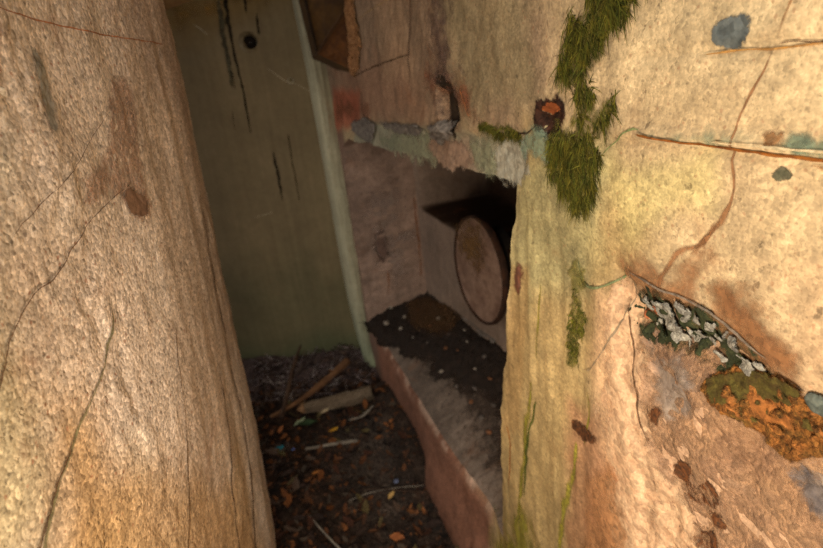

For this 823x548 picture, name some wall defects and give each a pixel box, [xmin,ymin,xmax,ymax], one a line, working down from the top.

crack [706,41,823,55]
rust [542,102,561,115]
spalling [638,295,823,548]